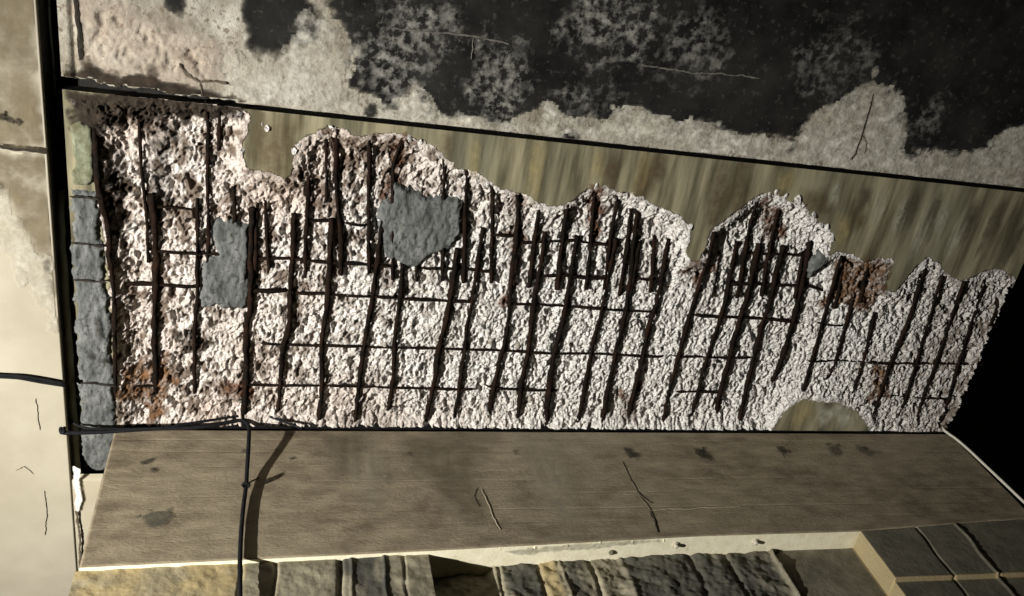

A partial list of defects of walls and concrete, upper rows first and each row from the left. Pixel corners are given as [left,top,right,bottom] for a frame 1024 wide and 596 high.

damp [383,87,489,128]
damp [531,84,1024,190]
crack [850,95,873,160]
spalling [69,0,1016,432]
rust [817,258,890,311]
rust [117,324,212,424]
crack [622,463,740,532]